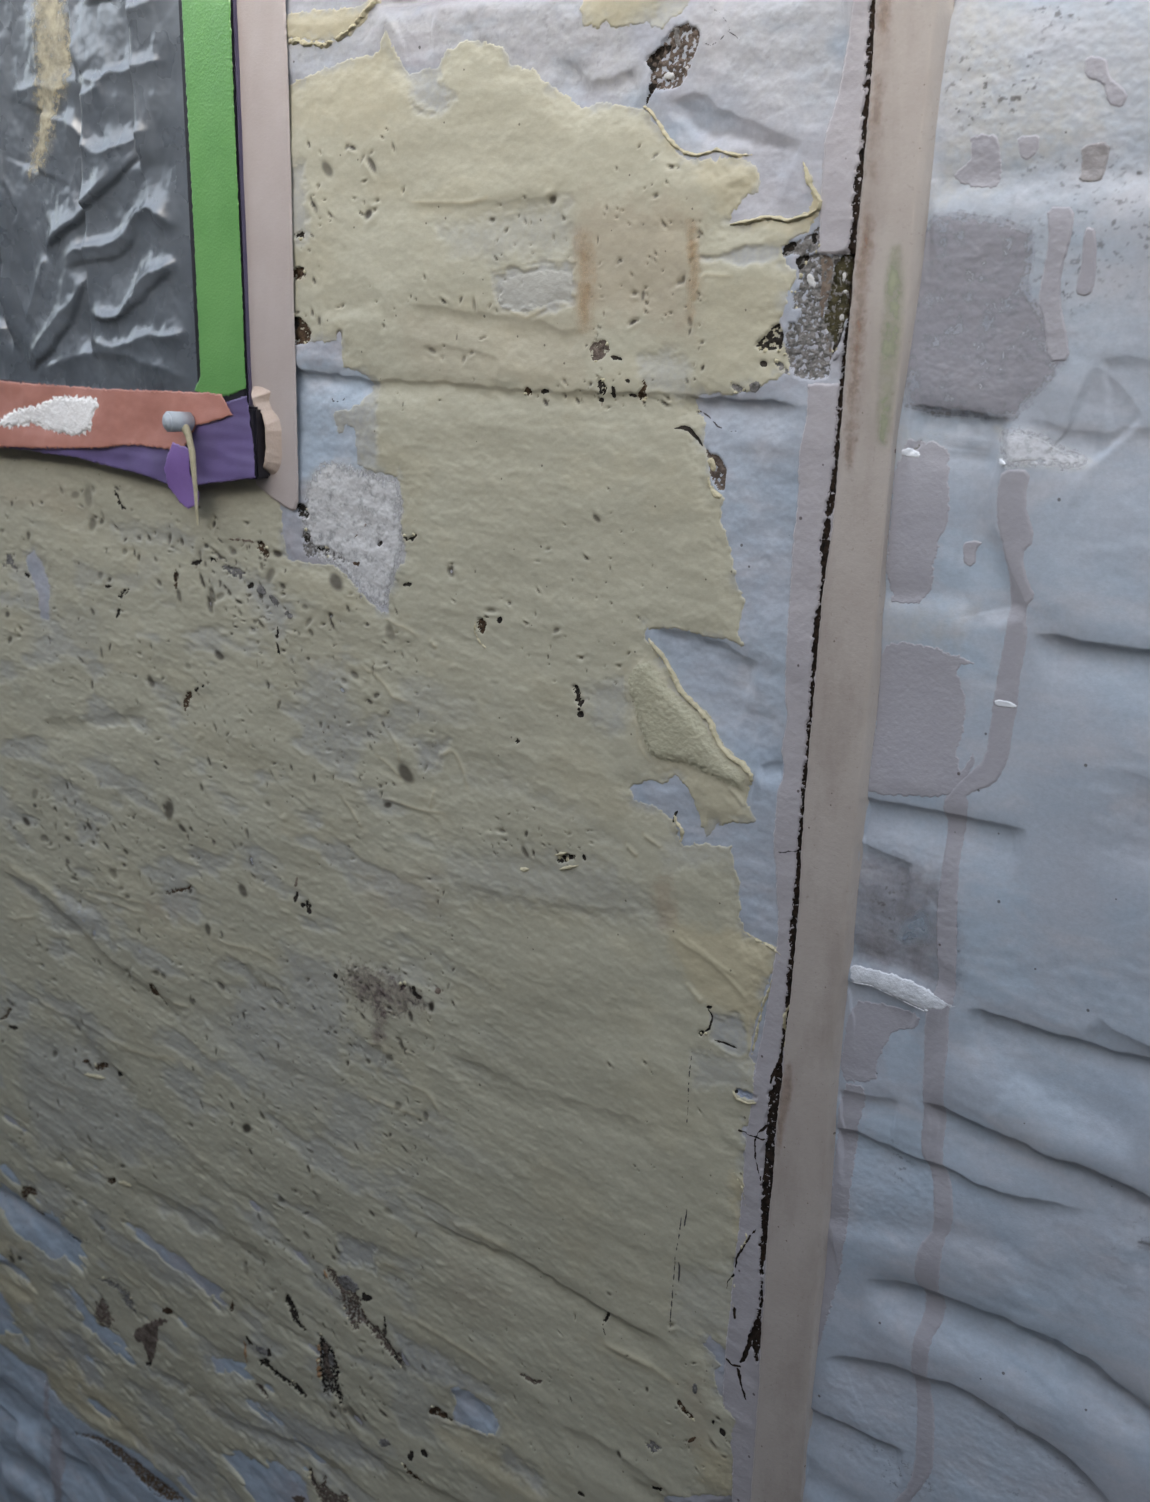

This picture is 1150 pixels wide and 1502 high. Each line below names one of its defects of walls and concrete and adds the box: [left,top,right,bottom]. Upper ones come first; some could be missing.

peeling [287,0,377,49]
spalling [643,23,752,158]
crack [848,0,876,255]
spalling [293,267,306,279]
spalling [729,162,854,394]
spalling [294,312,312,345]
spalling [589,340,647,402]
spalling [674,425,727,499]
peeling [296,461,417,607]
crack [726,318,850,1400]
spalling [94,1277,173,1366]
spalling [74,1431,184,1502]